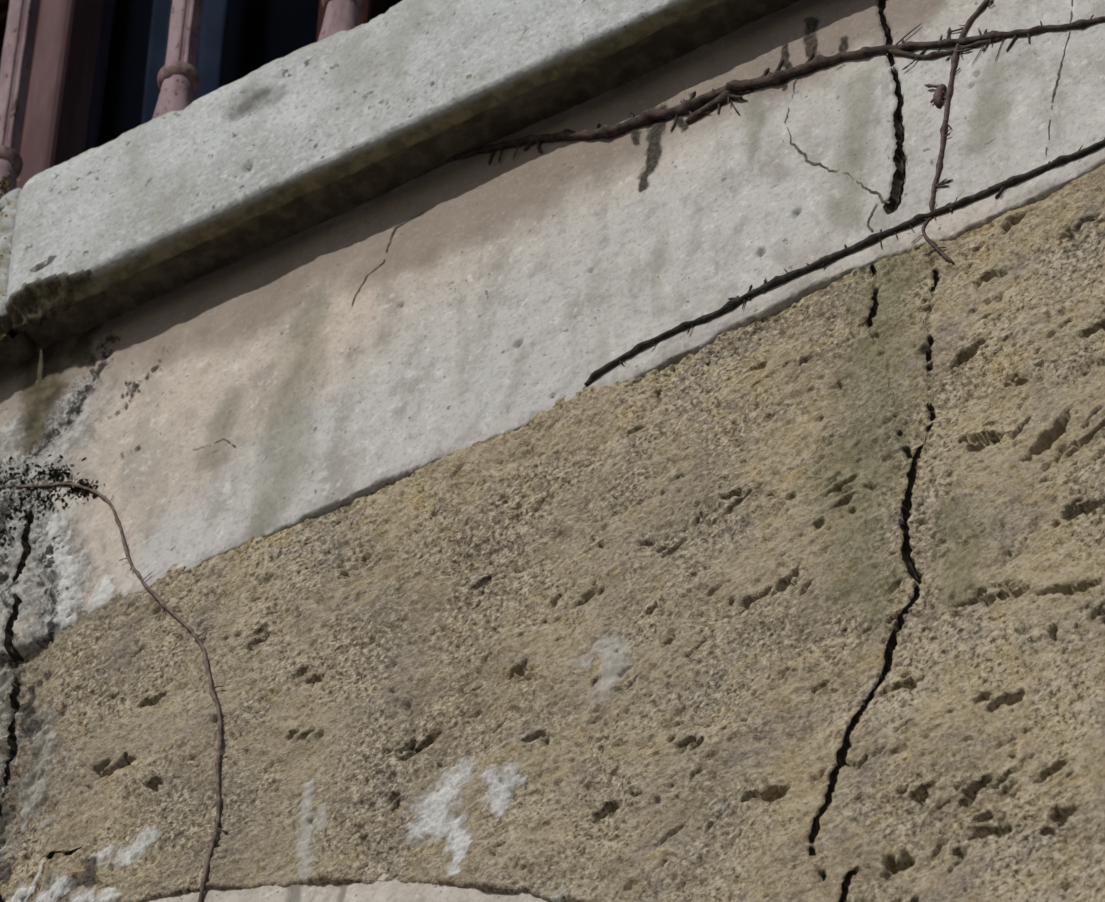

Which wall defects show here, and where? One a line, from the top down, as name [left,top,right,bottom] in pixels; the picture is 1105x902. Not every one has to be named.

crack [784,0,906,232]
crack [0,513,34,816]
water stain [0,527,68,866]
water stain [32,513,115,649]
crack [809,243,940,902]
crack [46,847,81,860]
water stain [2,829,159,902]
water stain [409,758,526,875]